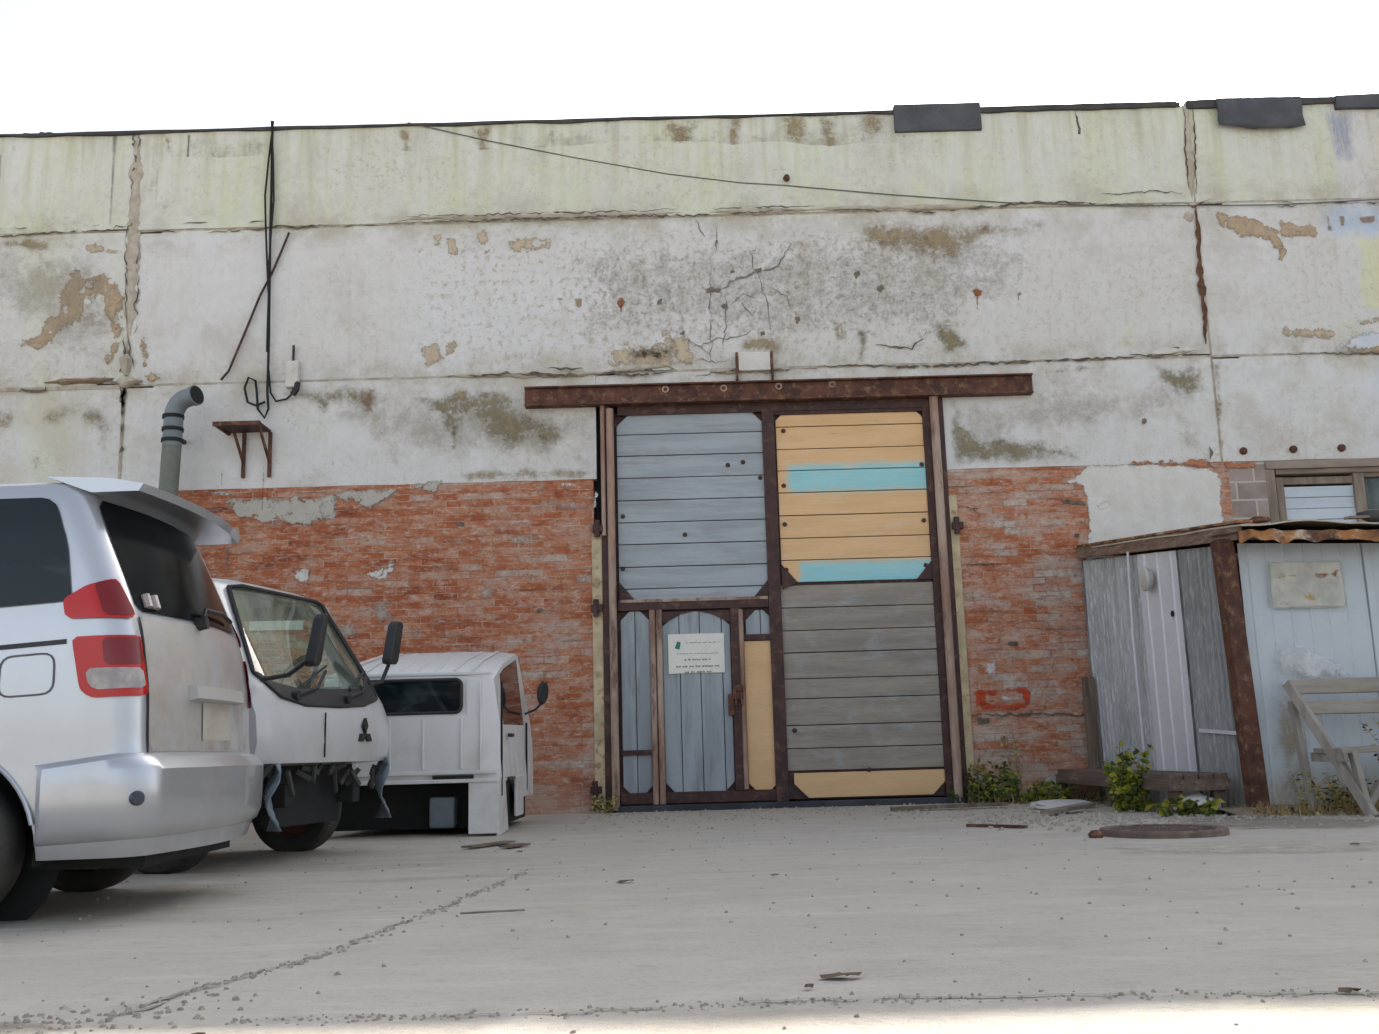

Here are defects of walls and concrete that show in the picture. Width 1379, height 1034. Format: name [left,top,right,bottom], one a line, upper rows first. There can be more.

spalling [85,242,118,253]
peeling [1217,211,1318,261]
crack [0,104,1210,465]
peeling [18,267,124,365]
spalling [421,340,457,366]
peeling [608,331,693,367]
peeling [1282,317,1379,355]
water stain [311,390,373,411]
water stain [422,391,559,442]
corrosion [1211,528,1379,544]